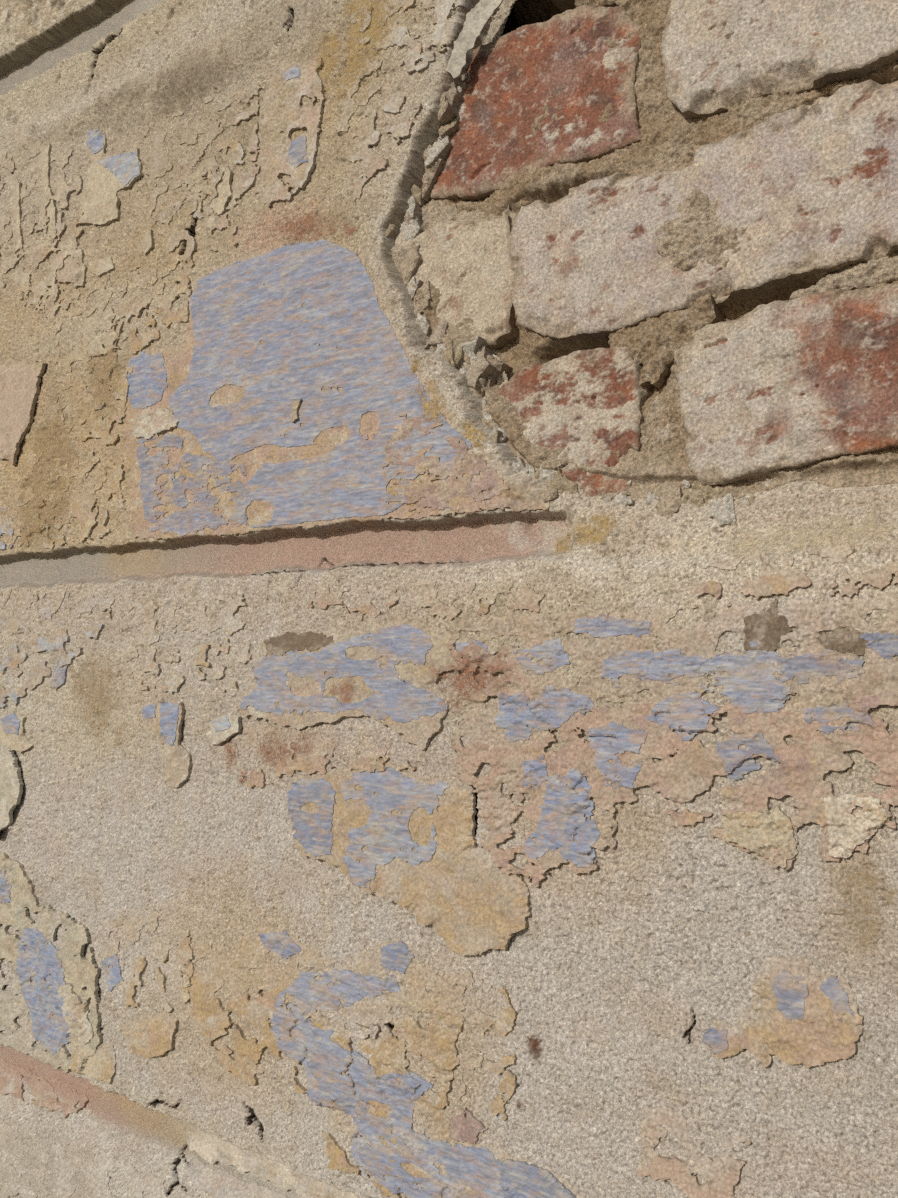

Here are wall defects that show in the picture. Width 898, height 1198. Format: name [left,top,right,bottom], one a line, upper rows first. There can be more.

spalling [0,0,898,550]
peeling [0,541,898,1198]
crack [149,1099,180,1109]
crack [245,1106,264,1142]
crack [167,1145,189,1196]